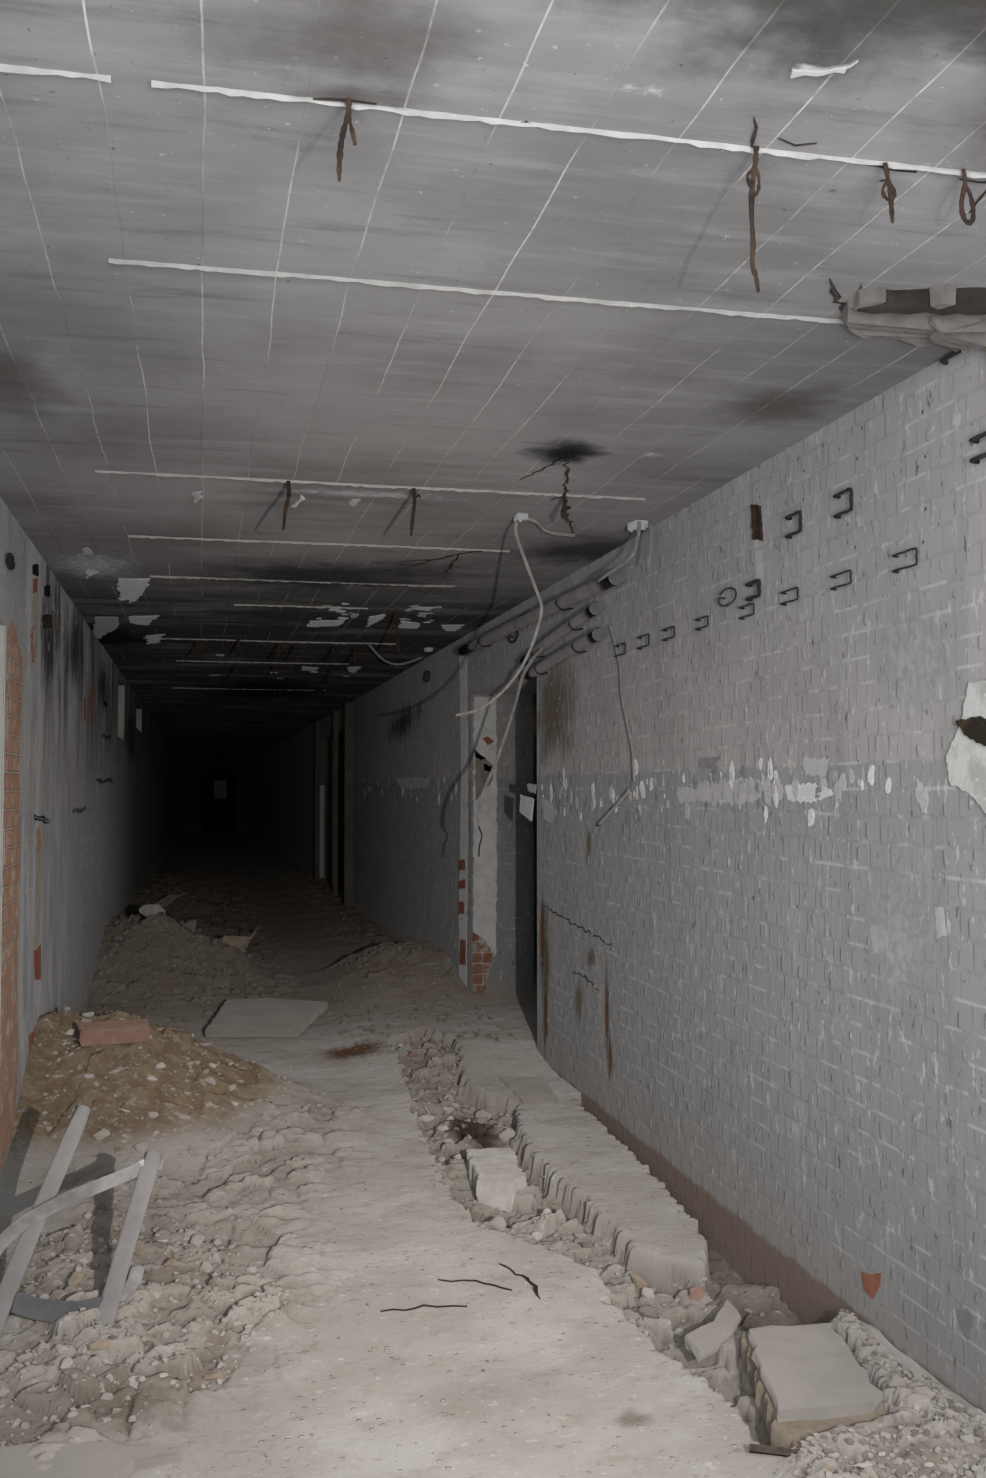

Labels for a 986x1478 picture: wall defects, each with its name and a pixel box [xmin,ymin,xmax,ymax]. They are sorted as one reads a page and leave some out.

crack [959,178,986,214]
spalling [842,283,986,355]
crack [520,460,574,533]
peeling [307,603,465,631]
spalling [955,716,986,746]
peeling [519,756,891,835]
peeling [915,778,929,814]
peeling [363,654,498,993]
flaking render [0,564,52,1170]
crack [381,1263,540,1312]
peeling [956,1308,974,1340]